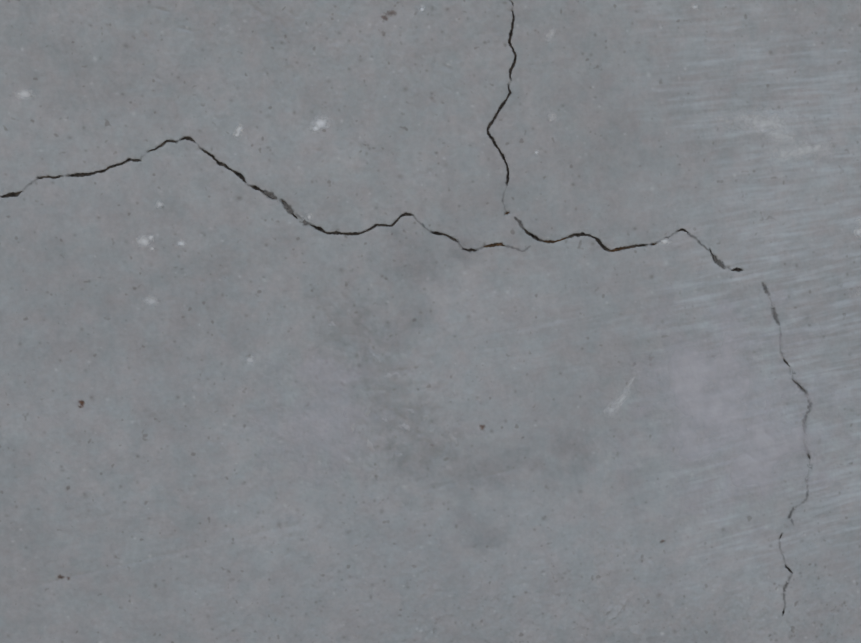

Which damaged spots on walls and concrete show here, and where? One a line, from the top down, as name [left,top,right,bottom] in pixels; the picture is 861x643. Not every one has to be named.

crack [487,1,516,184]
crack [0,137,412,235]
crack [432,231,505,252]
crack [505,212,657,252]
crack [679,228,743,272]
crack [763,284,779,324]
crack [783,358,811,458]